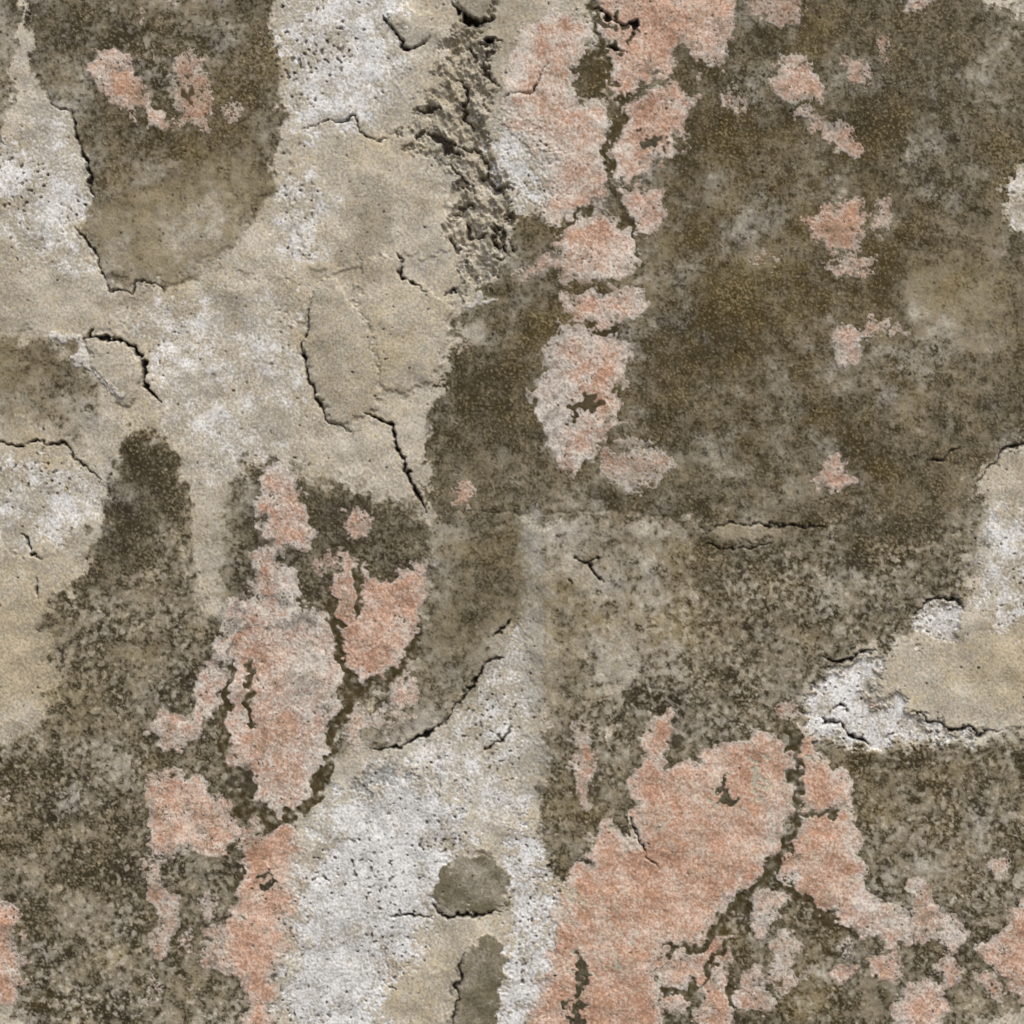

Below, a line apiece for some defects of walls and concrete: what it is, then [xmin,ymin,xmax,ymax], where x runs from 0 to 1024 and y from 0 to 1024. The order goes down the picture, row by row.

peeling [743,0,808,30]
spalling [0,96,99,295]
crack [50,102,96,202]
crack [74,227,164,296]
spalling [48,0,737,499]
crack [82,328,162,403]
crack [300,296,428,514]
crack [705,520,825,552]
damp [0,322,438,1024]
crack [373,619,513,751]
spalling [139,461,977,1024]
peeling [981,848,1012,882]